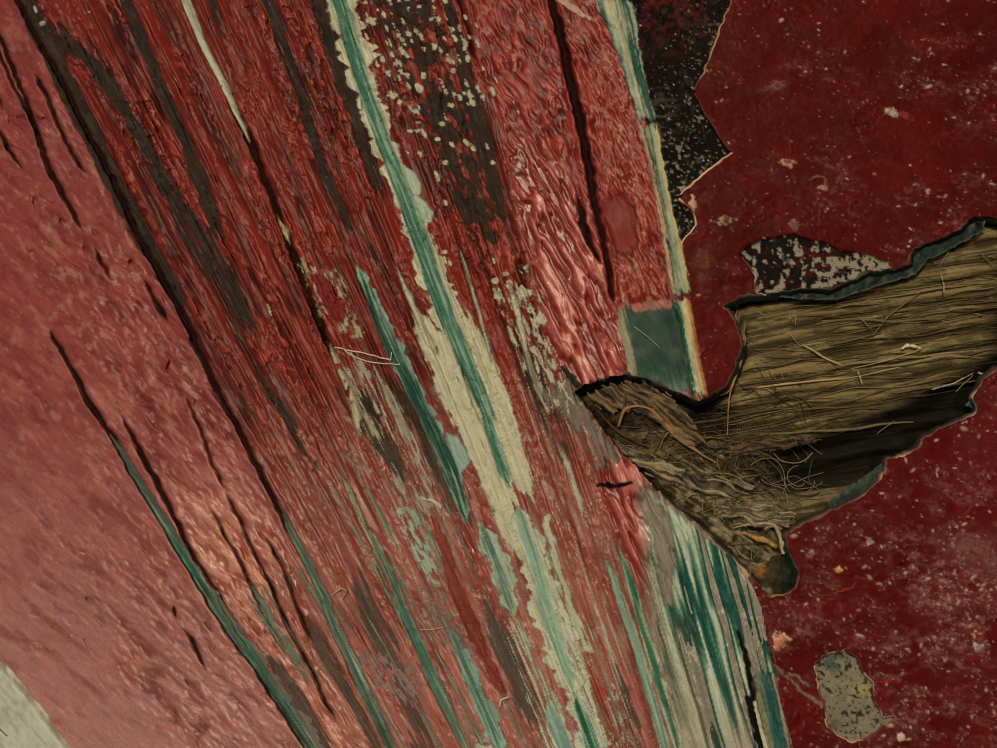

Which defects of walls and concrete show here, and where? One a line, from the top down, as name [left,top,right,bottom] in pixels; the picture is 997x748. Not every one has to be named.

crack [0,0,334,717]
peeling [298,256,365,339]
peeling [329,344,468,654]
peeling [412,292,535,558]
crack [548,0,614,301]
peeling [601,191,637,255]
peeling [628,0,733,246]
spalling [498,215,997,597]
peeling [355,648,422,710]
peeling [509,513,633,748]
peeling [753,670,789,748]
peeling [814,648,898,743]